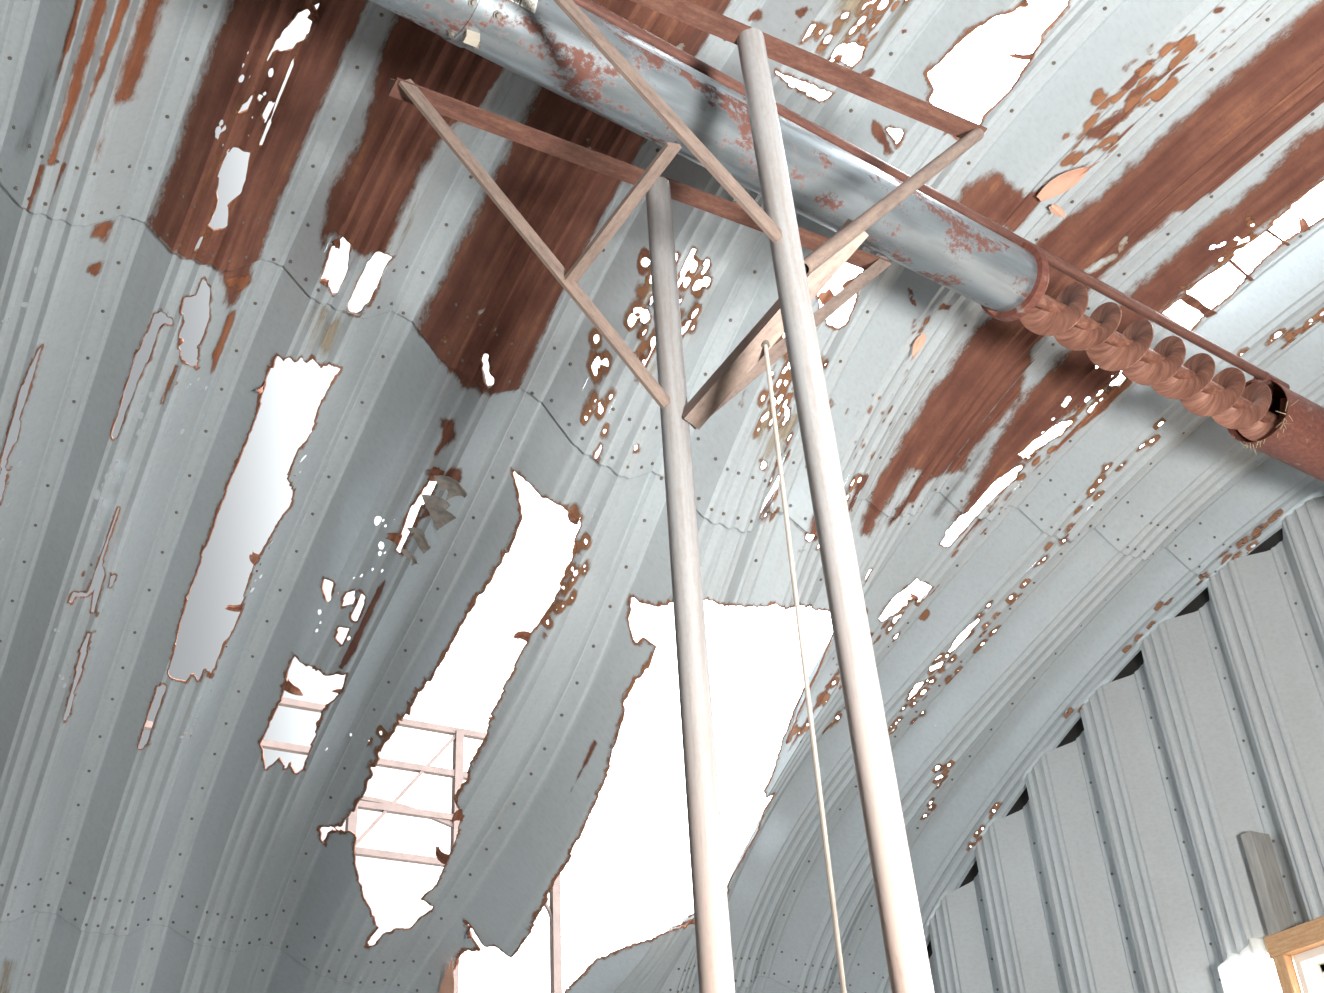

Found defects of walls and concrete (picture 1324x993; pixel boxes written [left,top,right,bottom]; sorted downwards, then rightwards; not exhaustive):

rust [27,0,164,211]
rust [148,0,369,372]
rust [321,14,504,256]
rust [418,141,621,396]
rust [956,0,1324,334]
peeling [1298,217,1310,233]
peeling [284,679,303,696]
peeling [386,533,403,545]
peeling [512,631,531,642]
rust [845,317,1132,557]
peeling [435,846,449,865]
peeling [452,796,463,823]